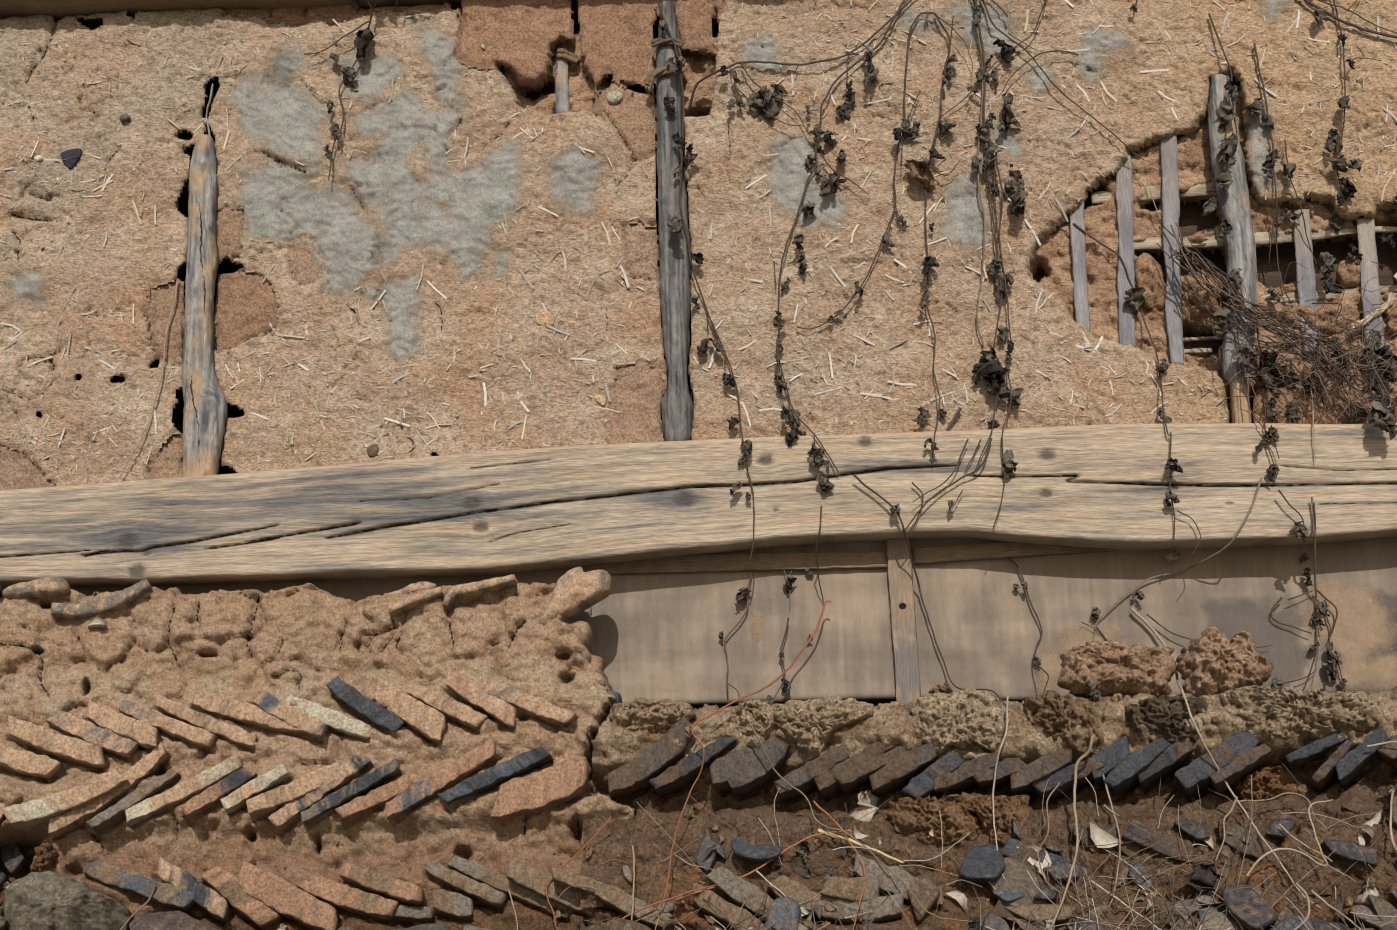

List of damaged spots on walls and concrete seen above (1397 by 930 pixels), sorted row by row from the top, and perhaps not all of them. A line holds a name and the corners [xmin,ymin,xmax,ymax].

peeling [213,0,726,360]
spalling [1029,86,1232,423]
spalling [1235,85,1397,252]
spalling [1249,264,1397,415]
damp [1375,596,1397,656]